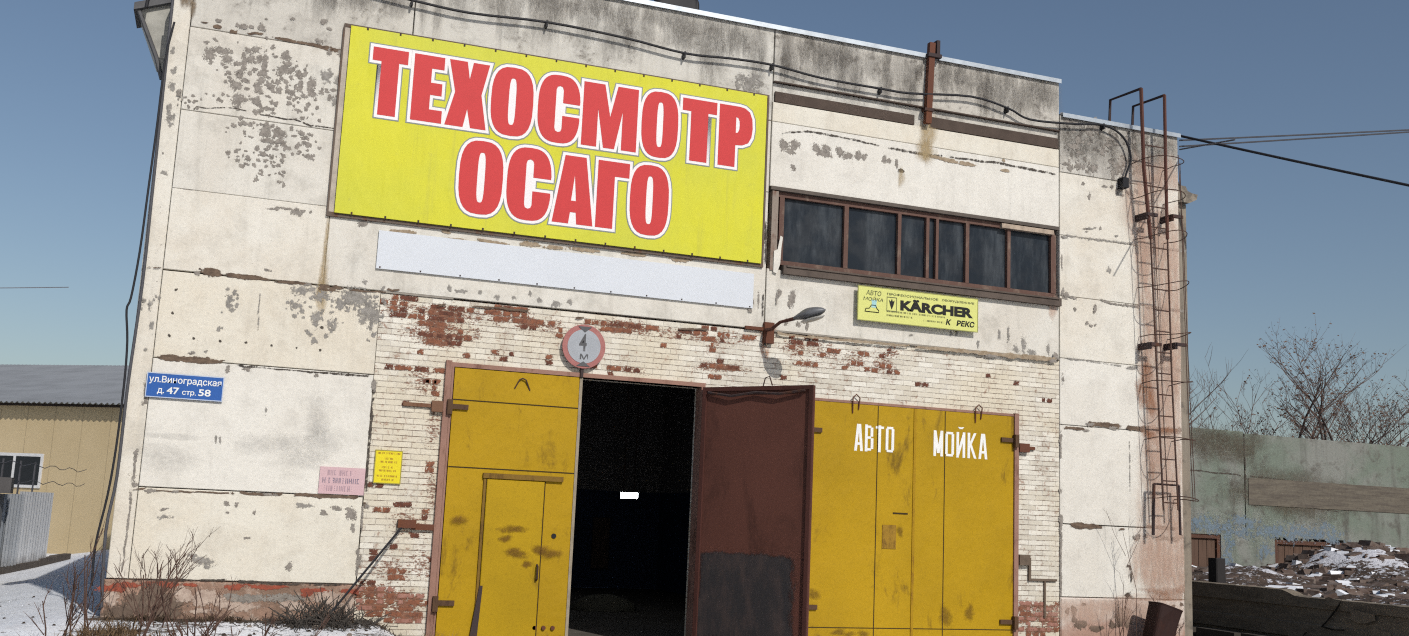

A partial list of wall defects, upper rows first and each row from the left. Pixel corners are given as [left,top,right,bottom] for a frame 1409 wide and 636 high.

peeling [165,18,349,188]
peeling [267,206,312,217]
rust [1062,168,1184,621]
flaking render [1018,601,1132,636]